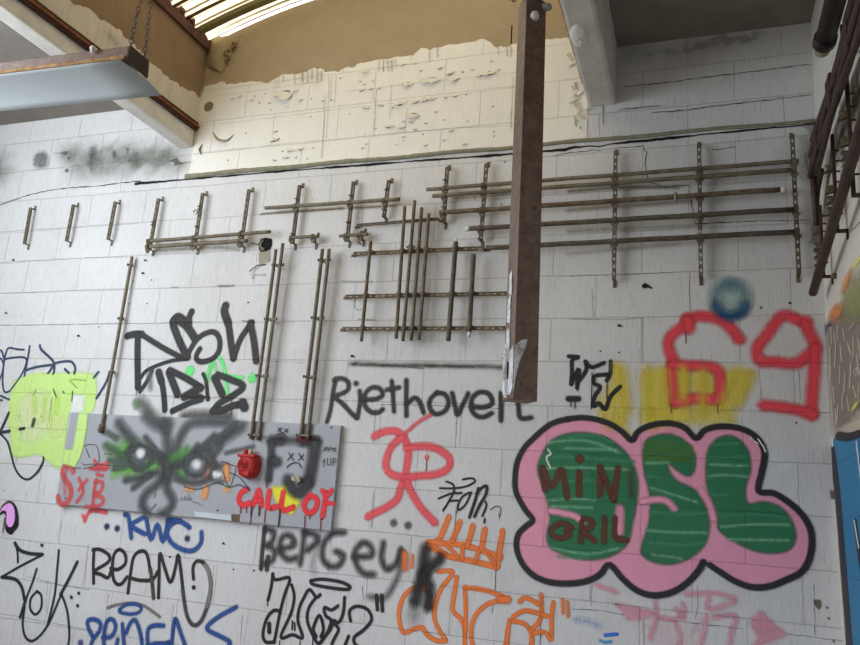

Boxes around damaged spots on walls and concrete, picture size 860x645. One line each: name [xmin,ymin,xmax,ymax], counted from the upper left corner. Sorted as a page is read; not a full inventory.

peeling [38,0,517,174]
peeling [543,38,589,143]
crack [602,95,807,121]
crack [624,64,809,87]
crack [0,153,513,205]
crack [543,123,814,224]